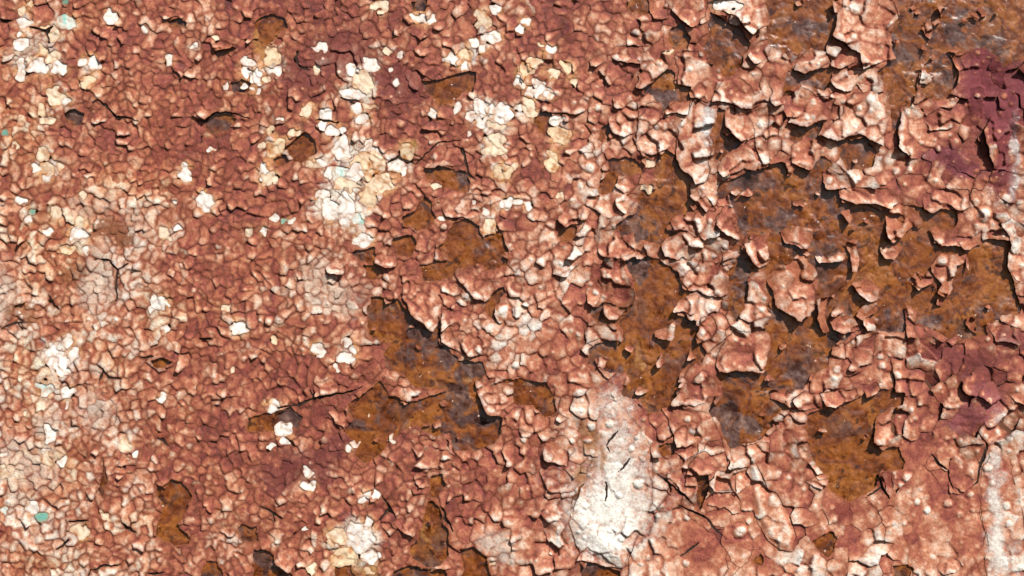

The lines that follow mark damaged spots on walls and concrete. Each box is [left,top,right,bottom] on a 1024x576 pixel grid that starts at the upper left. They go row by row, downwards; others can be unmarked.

crack [833,53,862,116]
crack [922,64,1024,212]
peeling [69,132,596,576]
crack [0,0,806,576]
peeling [531,0,1024,576]
crack [847,560,883,576]
crack [867,474,902,528]
crack [918,330,1024,576]